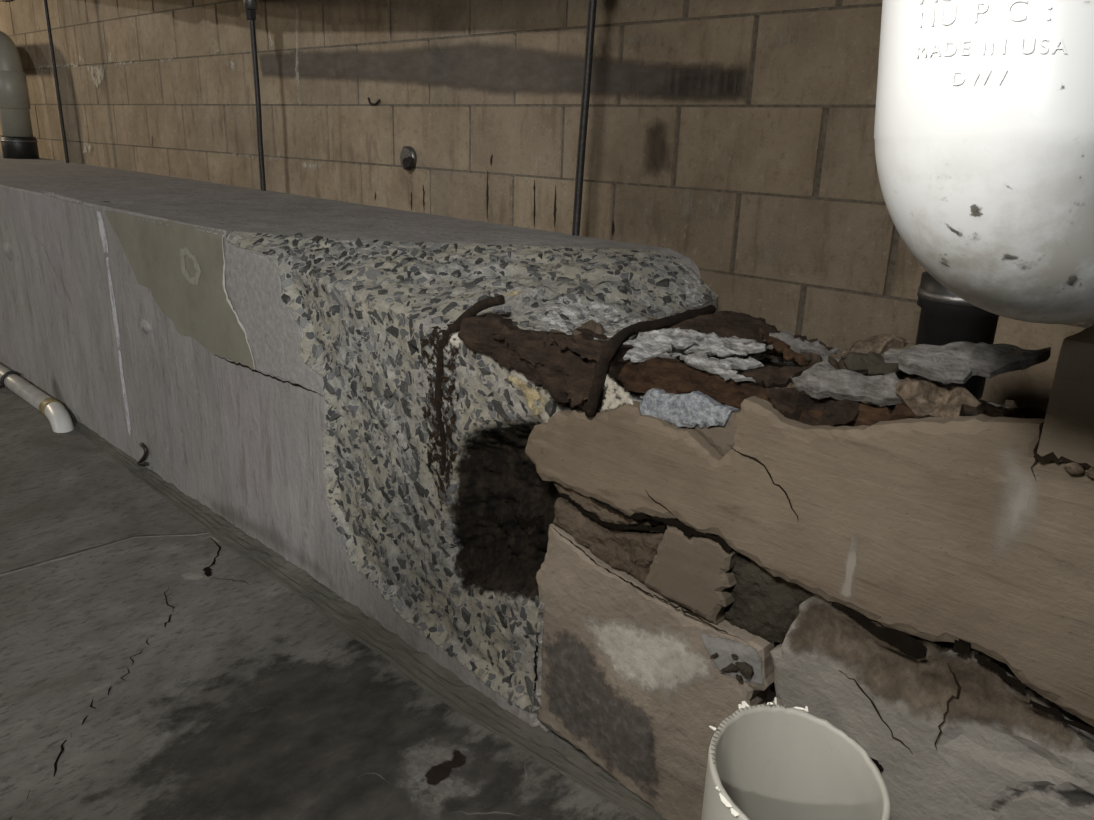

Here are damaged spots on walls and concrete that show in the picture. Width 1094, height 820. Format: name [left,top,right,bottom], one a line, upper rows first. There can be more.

crack [201,538,249,585]
crack [214,355,322,396]
flaking render [103,201,1094,748]
crack [559,489,735,553]
corrosion [420,313,917,511]
crack [731,448,799,522]
crack [53,589,175,777]
damp [131,639,597,820]
damp [544,618,710,797]
crack [831,603,1094,754]